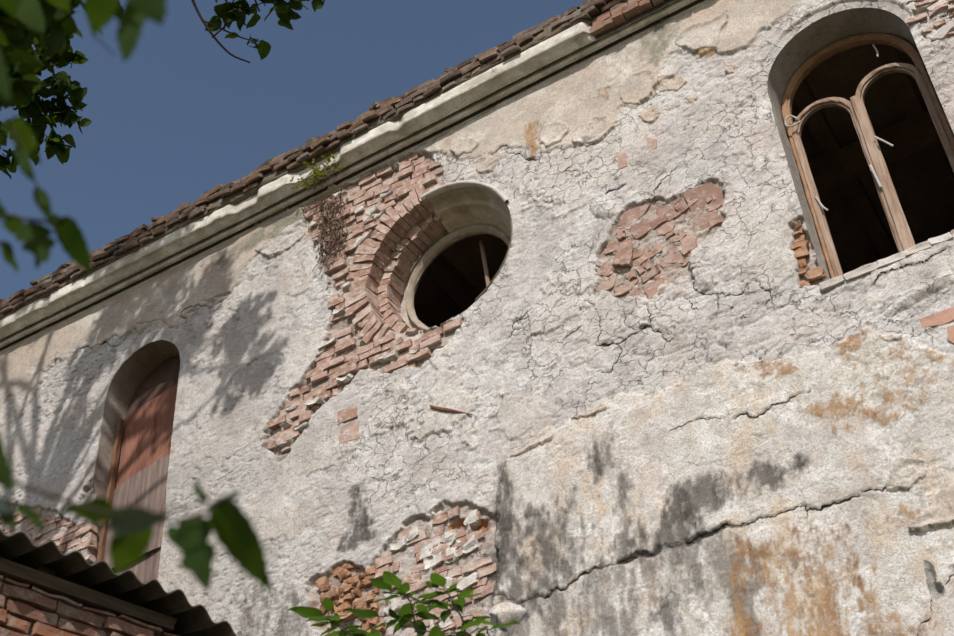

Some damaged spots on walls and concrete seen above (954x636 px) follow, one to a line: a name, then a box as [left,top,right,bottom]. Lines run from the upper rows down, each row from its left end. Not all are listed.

peeling [675,9,729,53]
flaking render [255,137,500,454]
crack [567,300,676,373]
flaking render [590,182,725,299]
crack [685,281,772,318]
flaking render [790,219,827,288]
water stain [592,438,612,482]
flaking render [0,505,97,564]
flaking render [315,506,497,636]
water stain [483,467,575,636]
crack [497,486,886,602]
water stain [581,454,808,636]